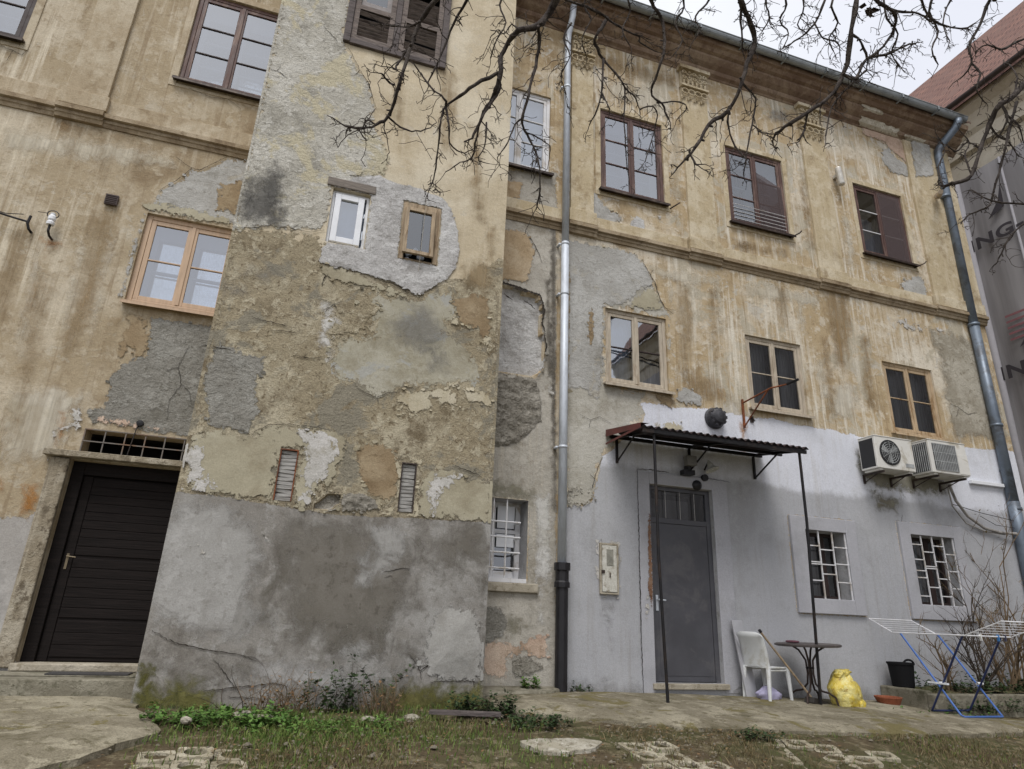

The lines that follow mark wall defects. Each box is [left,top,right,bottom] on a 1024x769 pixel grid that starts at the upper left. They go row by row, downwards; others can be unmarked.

flaking render [861,128,934,177]
spalling [319,262,425,299]
flaking render [52,313,267,437]
spalling [396,229,554,447]
flaking render [568,240,653,399]
damp [746,285,872,416]
flaking render [298,440,400,517]
crack [152,630,282,699]
flaking render [484,606,551,678]